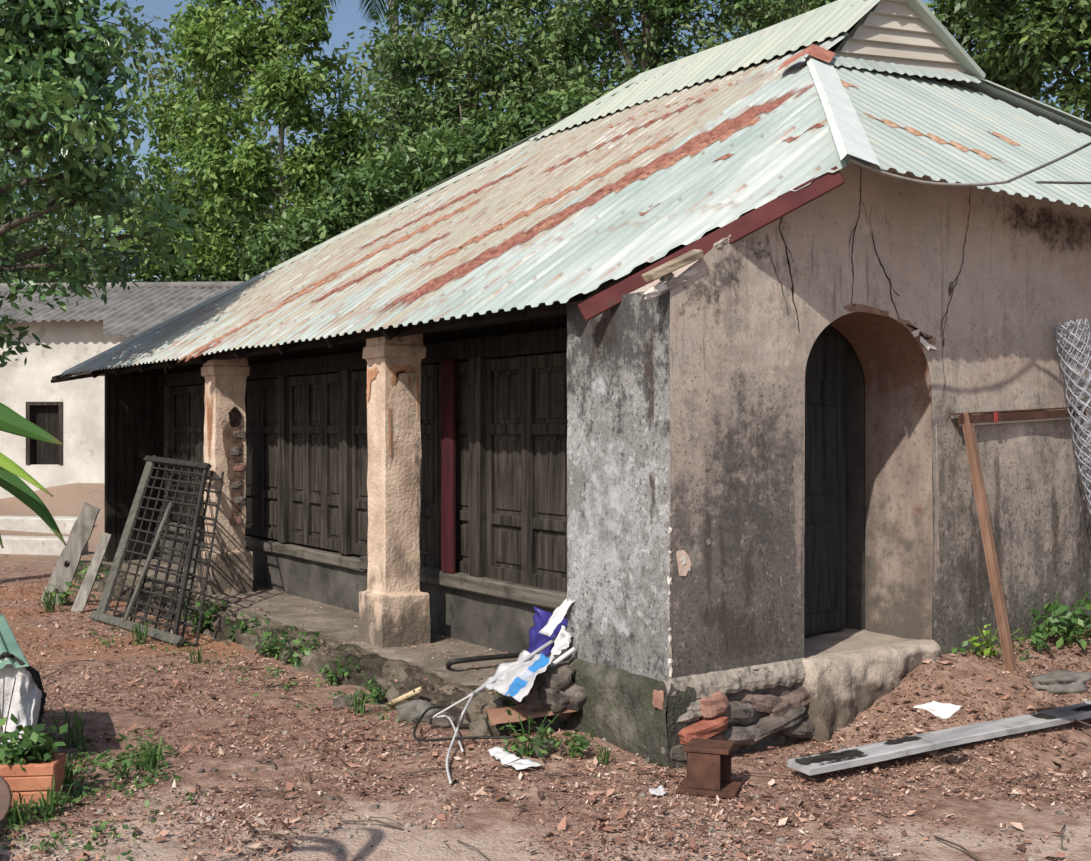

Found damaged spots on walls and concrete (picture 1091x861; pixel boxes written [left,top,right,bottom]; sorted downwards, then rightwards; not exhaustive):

rust [864,112,1003,163]
rust [987,131,1020,145]
rust [178,79,813,362]
damp [644,334,654,424]
crack [770,217,800,333]
crack [849,172,901,318]
spalling [843,304,937,351]
crack [941,191,971,393]
damp [1008,205,1091,250]
spalling [221,406,247,526]
damp [579,441,632,586]
spalling [667,550,692,608]